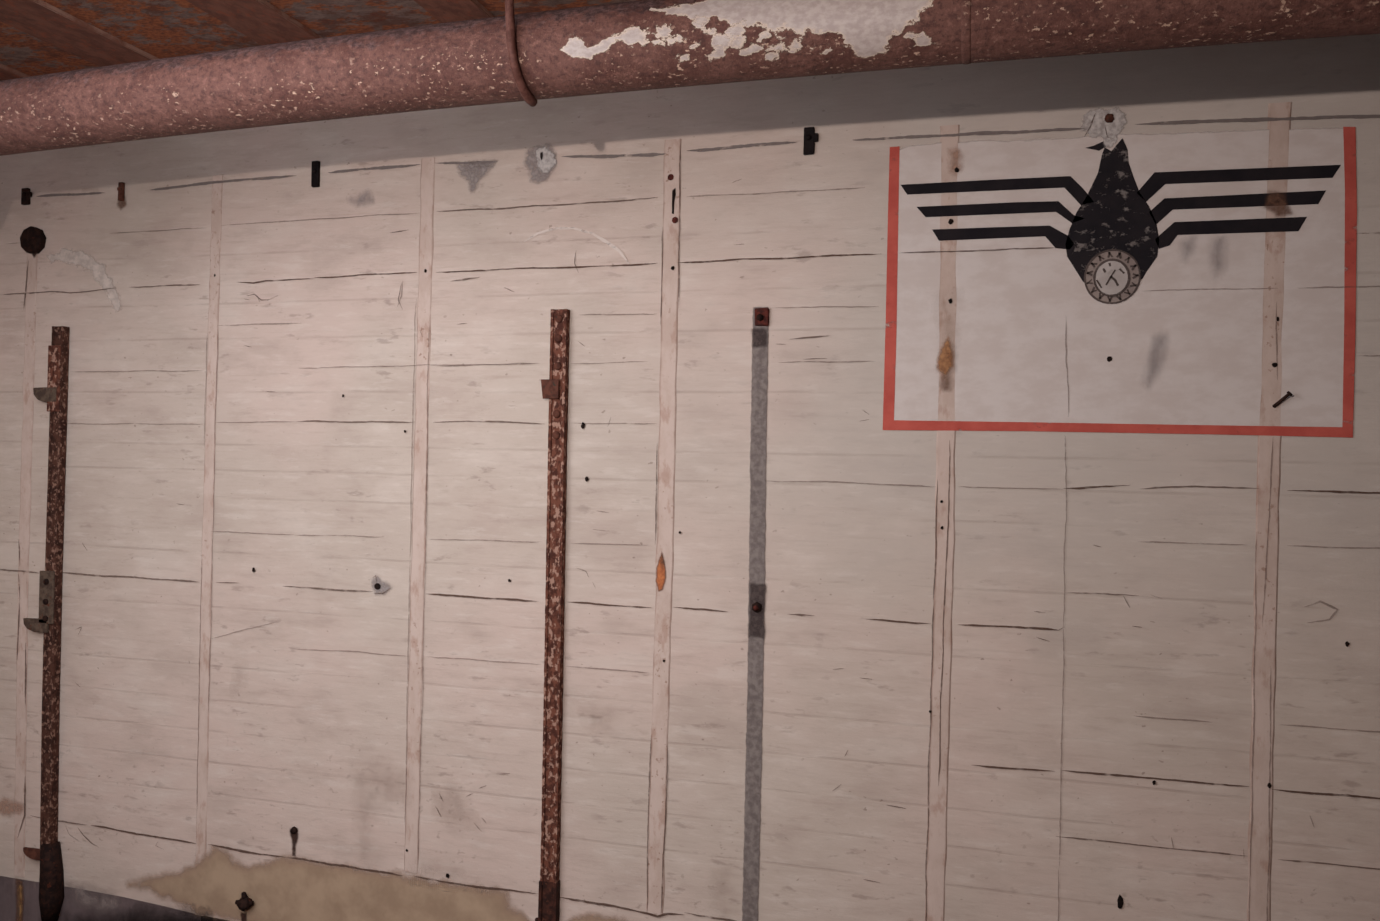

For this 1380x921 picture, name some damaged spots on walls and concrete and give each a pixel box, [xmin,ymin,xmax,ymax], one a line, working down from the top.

peeling [560,26,650,60]
peeling [649,0,933,58]
damp [128,848,529,921]